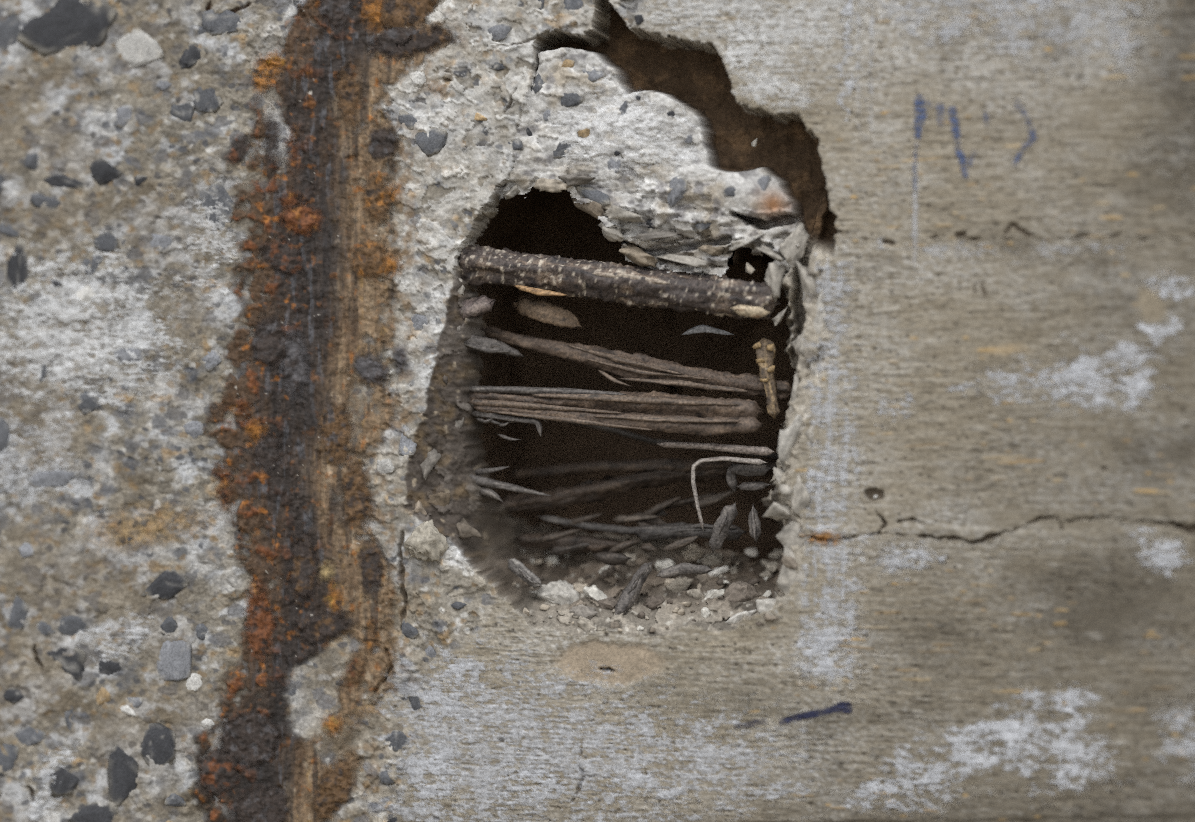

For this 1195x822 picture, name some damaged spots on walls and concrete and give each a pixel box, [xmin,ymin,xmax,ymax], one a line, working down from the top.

rust [459,245,780,320]
spalling [0,0,317,822]
rust [189,0,455,822]
spalling [282,0,836,822]
rust [499,458,777,514]
crack [806,511,1195,546]
efflorescence [845,685,1120,811]
efflorescence [1153,714,1195,760]